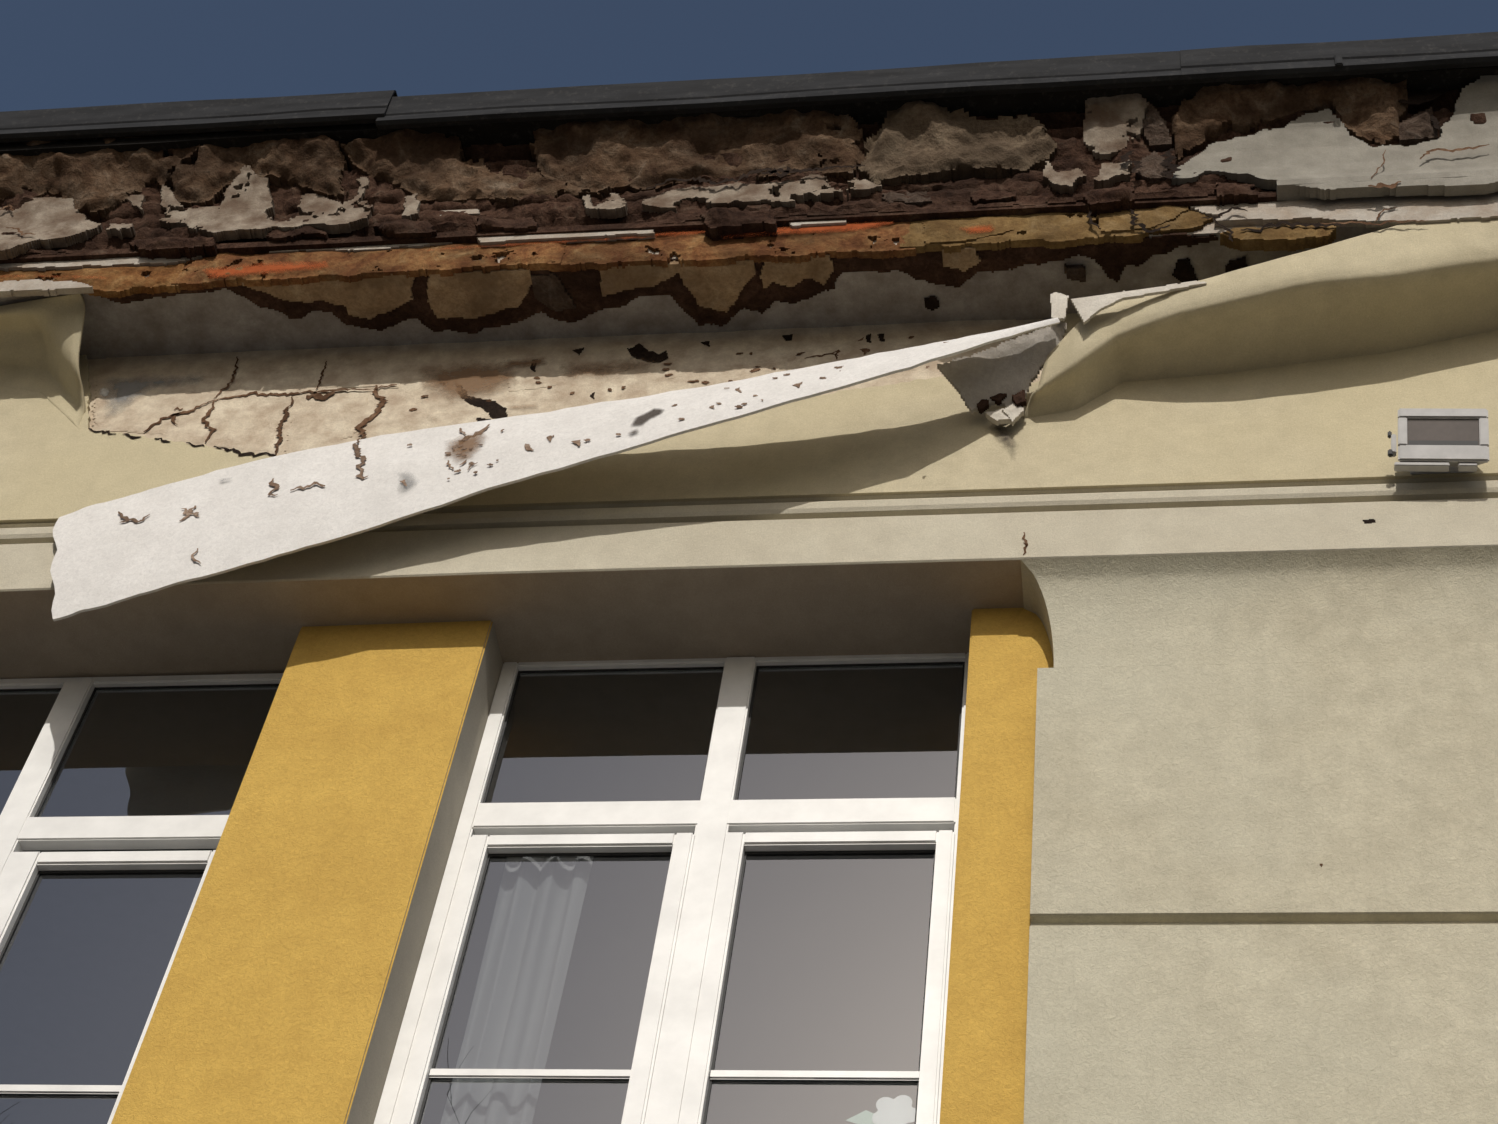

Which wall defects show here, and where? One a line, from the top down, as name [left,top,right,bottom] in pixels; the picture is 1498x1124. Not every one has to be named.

crack [88,356,397,496]
spalling [0,75,1498,621]